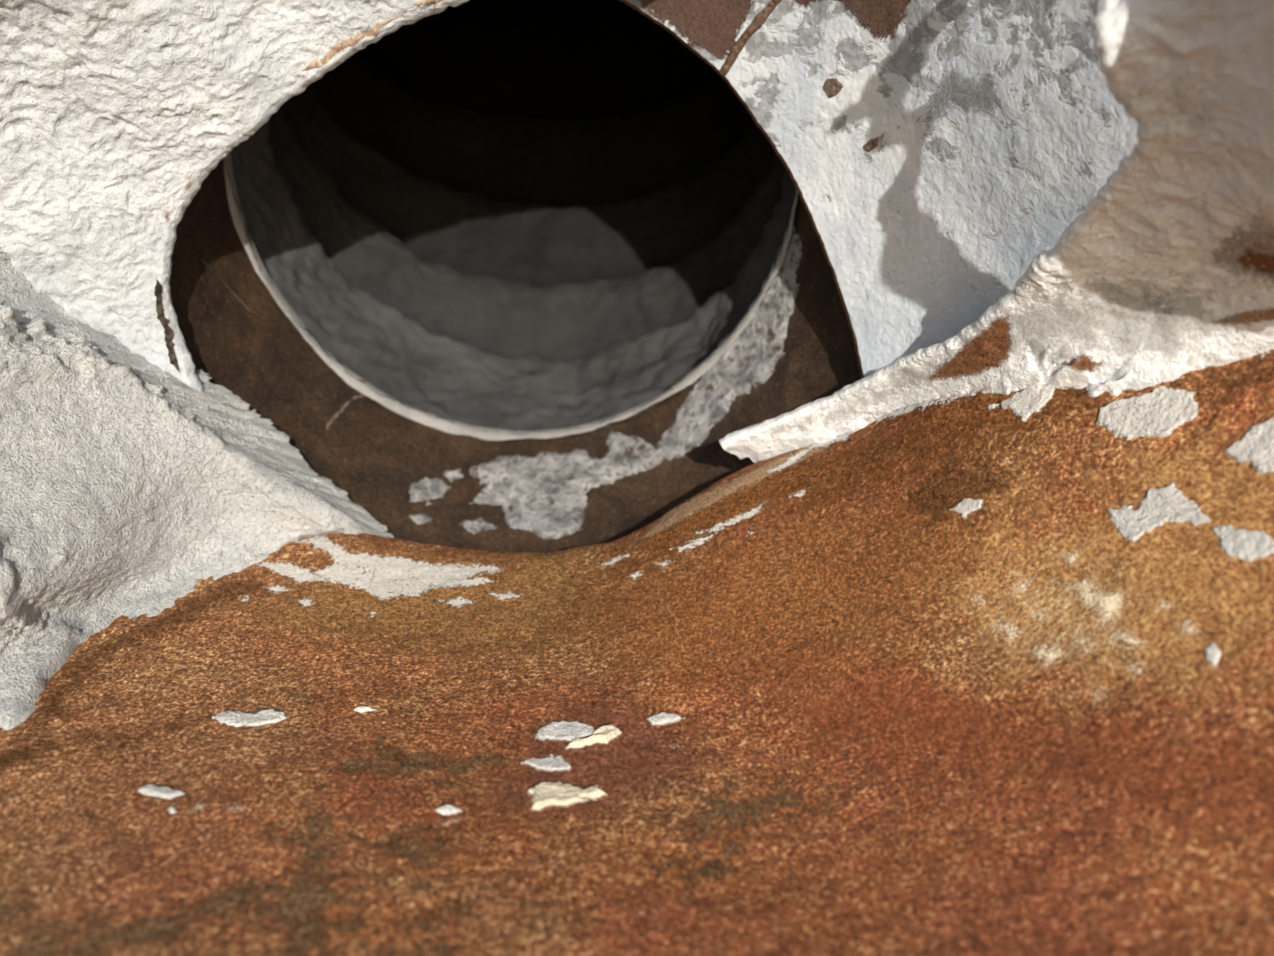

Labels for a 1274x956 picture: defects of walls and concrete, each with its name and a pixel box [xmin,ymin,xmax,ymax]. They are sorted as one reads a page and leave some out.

peeling [629,0,755,60]
crack [154,279,180,373]
peeling [409,226,802,539]
corrosion [1063,355,1101,373]
peeling [1096,385,1199,440]
peeling [1224,417,1274,476]
peeling [256,535,522,617]
corrosion [235,556,581,653]
corrosion [588,388,1274,692]
peeling [1107,482,1274,563]
peeling [212,708,287,727]
peeling [520,720,622,811]